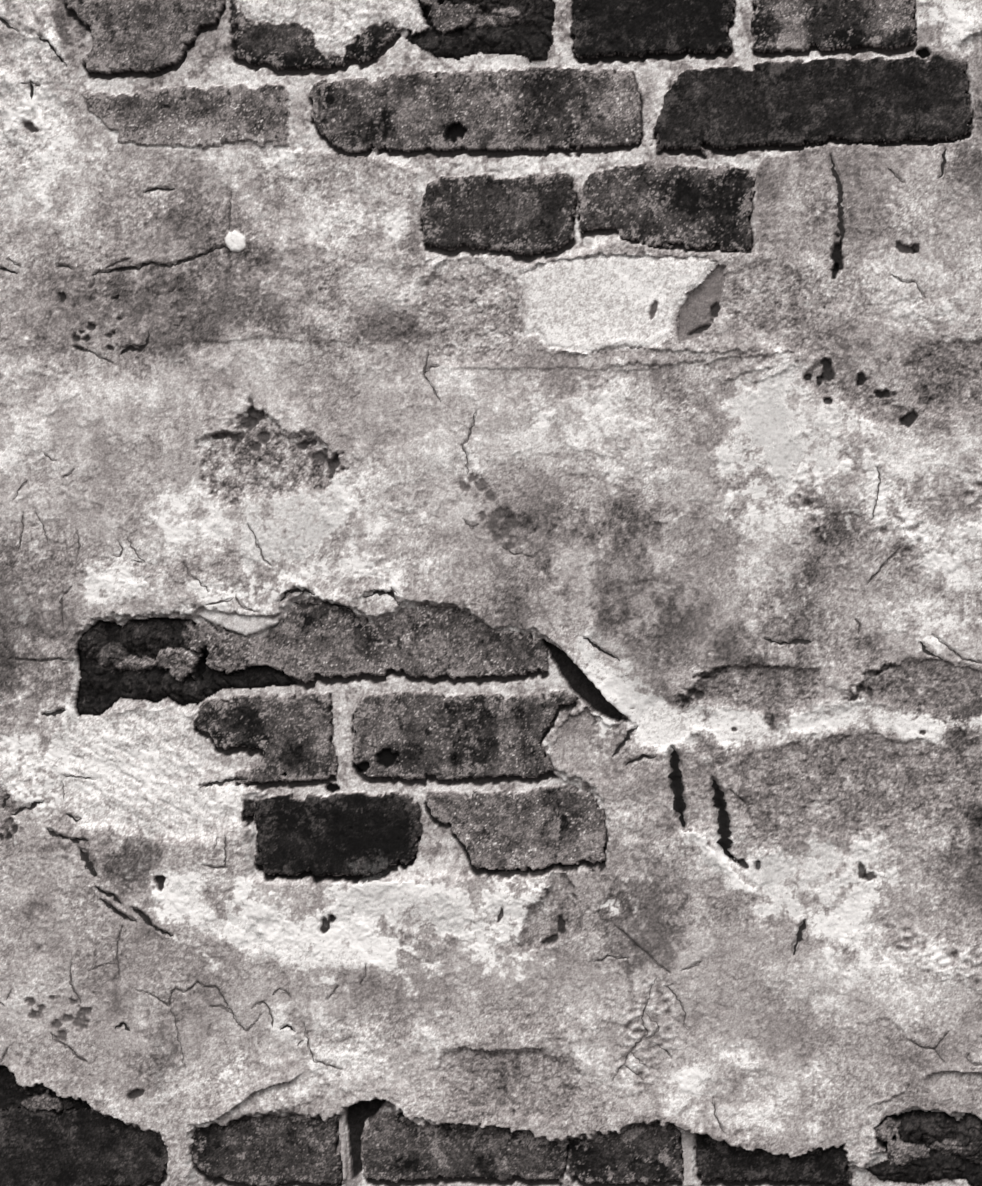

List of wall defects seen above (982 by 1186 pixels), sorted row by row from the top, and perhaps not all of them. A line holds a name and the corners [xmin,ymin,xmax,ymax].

flaking render [43,0,982,429]
crack [831,155,847,250]
flaking render [195,403,343,509]
crack [583,638,620,662]
crack [920,634,982,664]
crack [200,777,247,788]
flaking render [55,586,637,955]
crack [612,726,746,863]
crack [2,775,173,1003]
crack [201,837,229,869]
crack [142,982,342,1070]
flaking render [0,966,982,1186]